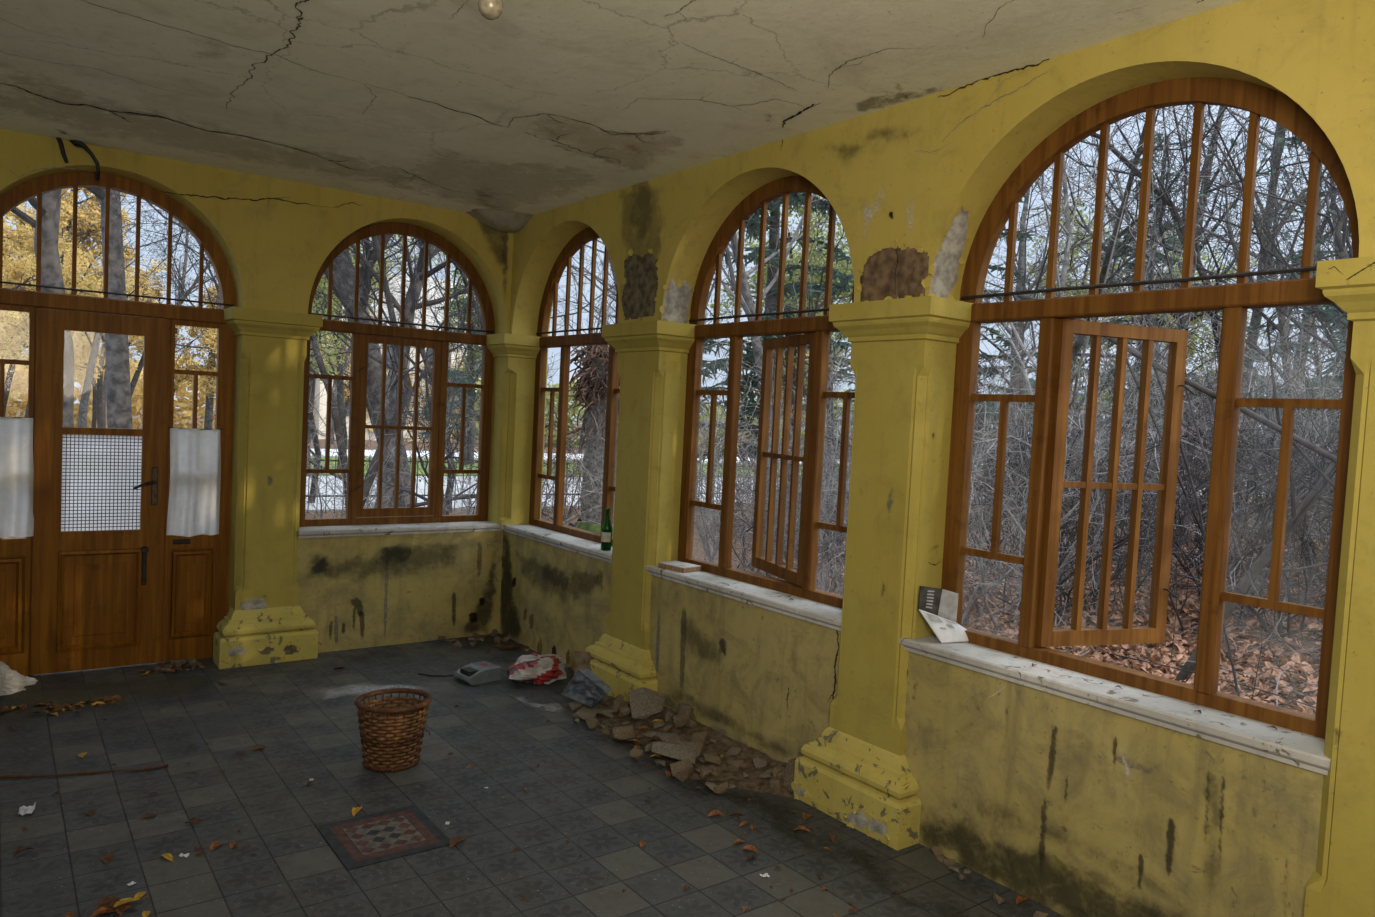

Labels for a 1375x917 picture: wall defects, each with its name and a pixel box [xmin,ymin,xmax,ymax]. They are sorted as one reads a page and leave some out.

crack [0,0,921,208]
spalling [621,249,694,324]
spalling [856,200,972,302]
peeling [228,641,301,661]
damp [329,598,365,642]
damp [365,547,451,633]
damp [452,536,599,637]
damp [664,611,727,733]
damp [1047,728,1057,780]
peeling [839,806,890,845]
damp [922,806,1163,917]
damp [1166,819,1175,872]